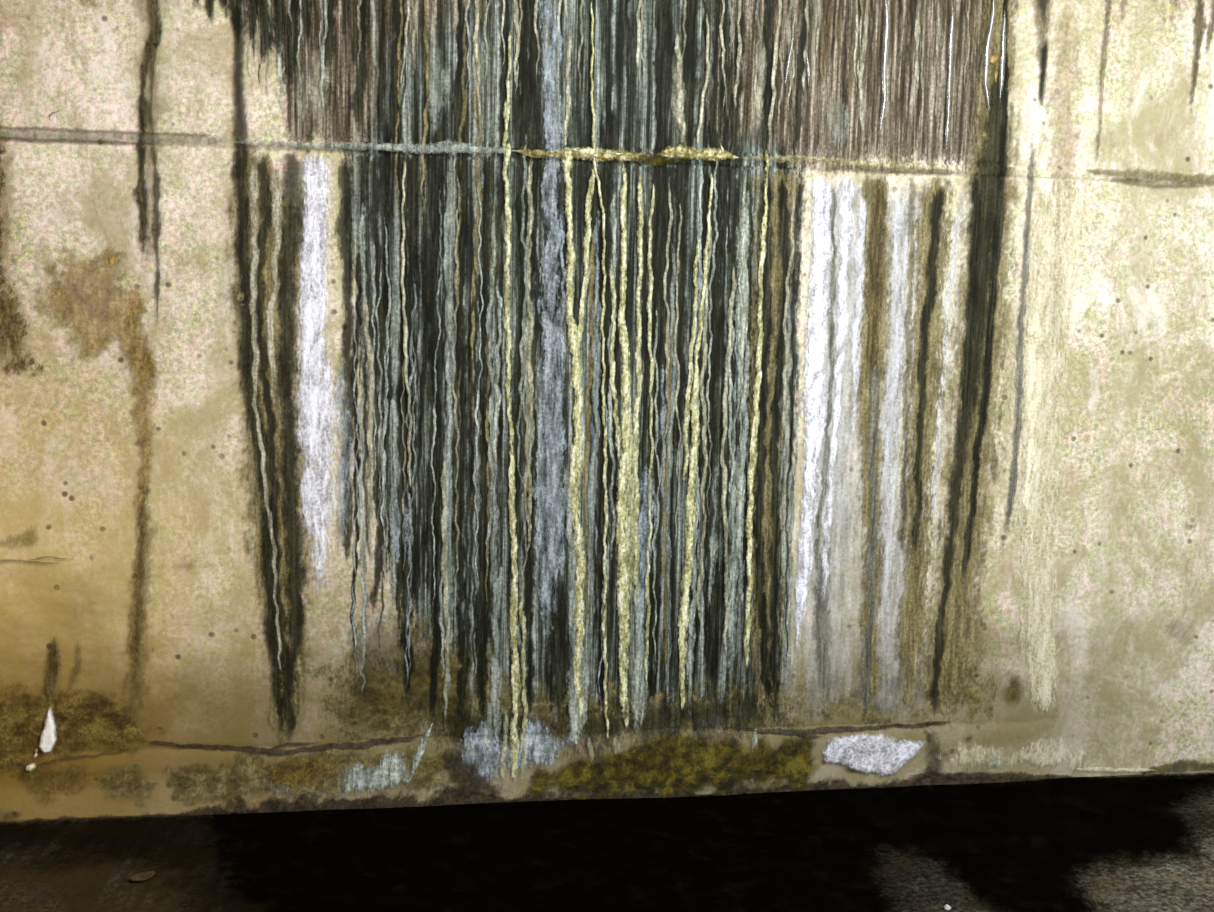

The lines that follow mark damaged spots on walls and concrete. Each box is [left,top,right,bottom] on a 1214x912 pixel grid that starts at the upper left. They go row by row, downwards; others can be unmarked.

damp [0,0,210,318]
damp [0,219,44,377]
damp [196,0,1090,793]
damp [26,638,61,772]
spalling [824,734,923,775]
damp [0,772,1214,912]